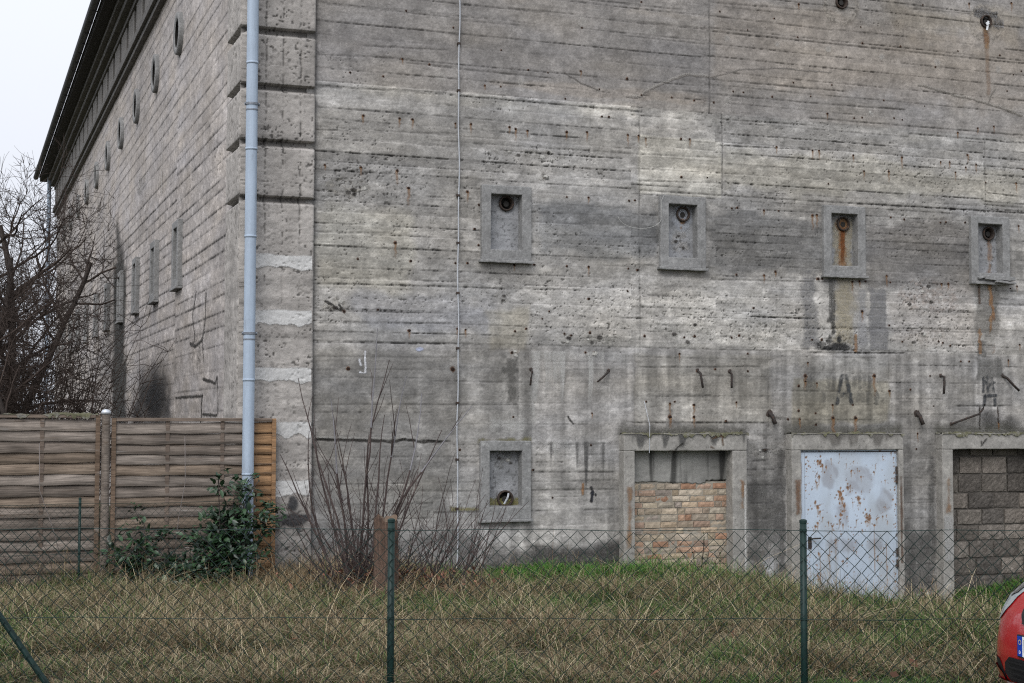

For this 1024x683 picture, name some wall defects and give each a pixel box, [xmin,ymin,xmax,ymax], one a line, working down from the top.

corrosion [833,219,852,266]
damp [826,278,888,350]
corrosion [960,284,995,362]